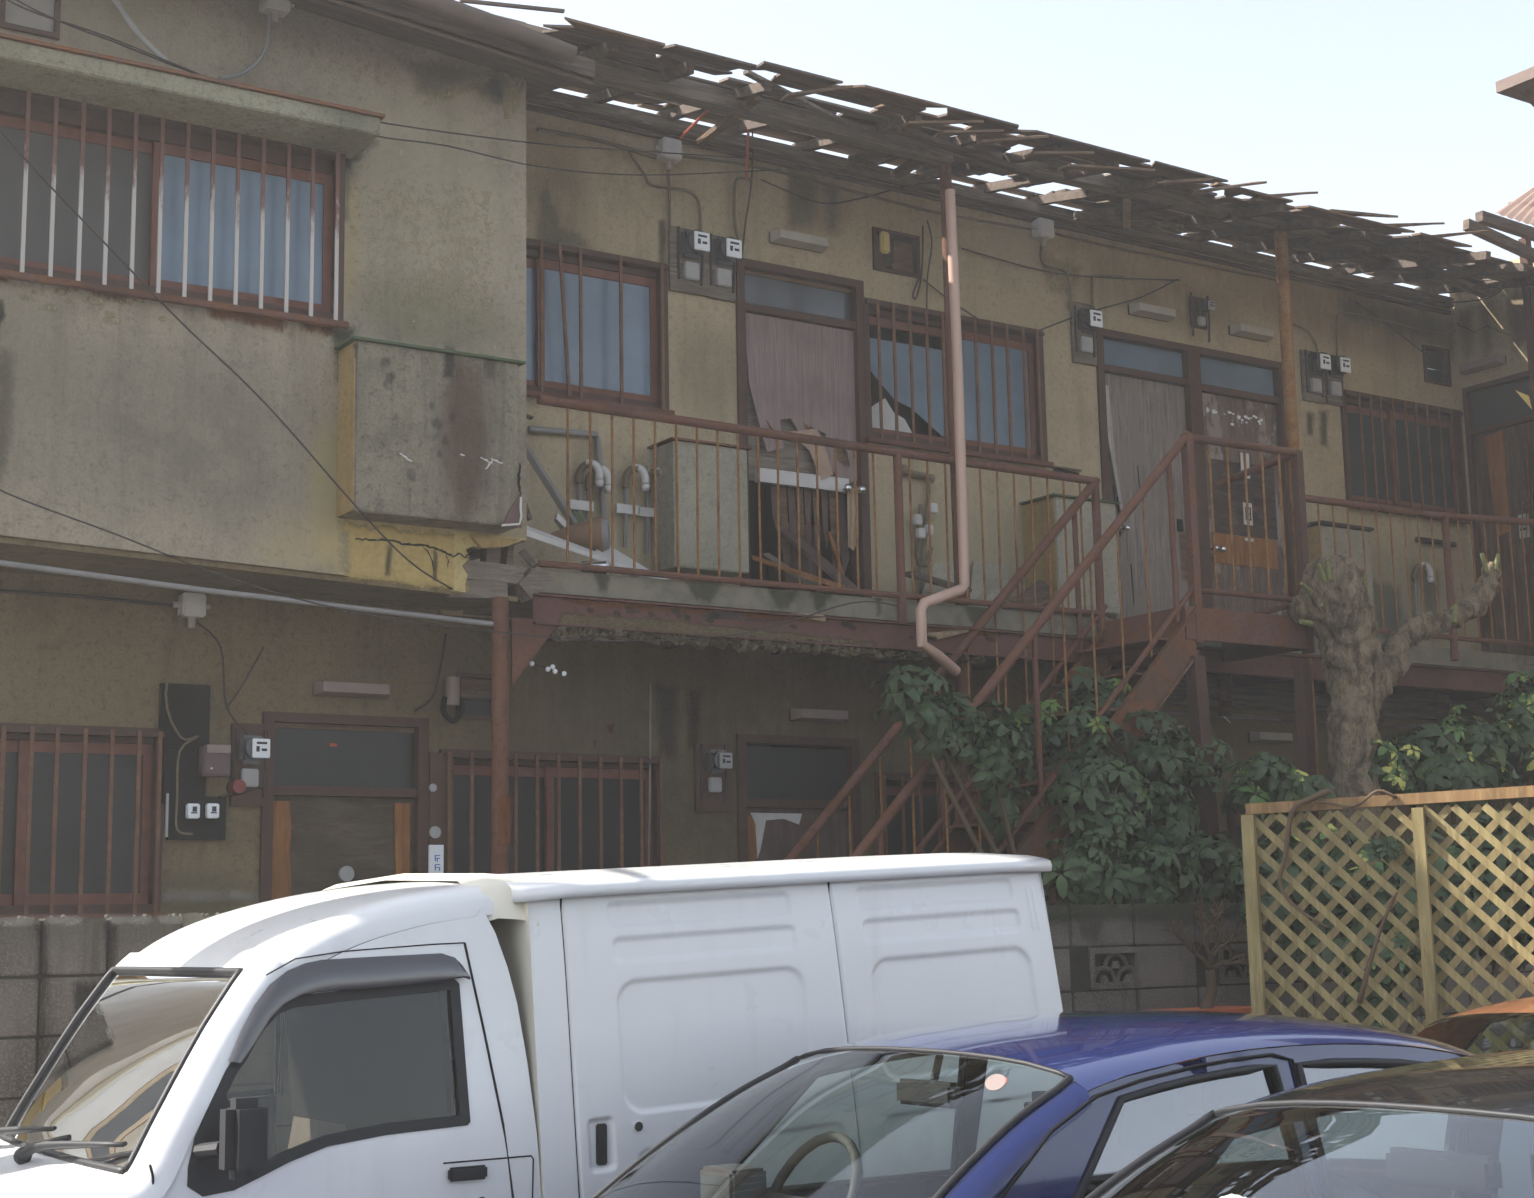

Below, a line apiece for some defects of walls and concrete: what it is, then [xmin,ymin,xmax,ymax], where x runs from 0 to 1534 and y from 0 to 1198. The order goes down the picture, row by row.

corrosion [209,309,284,331]
corrosion [562,598,818,629]
spalling [552,626,987,664]